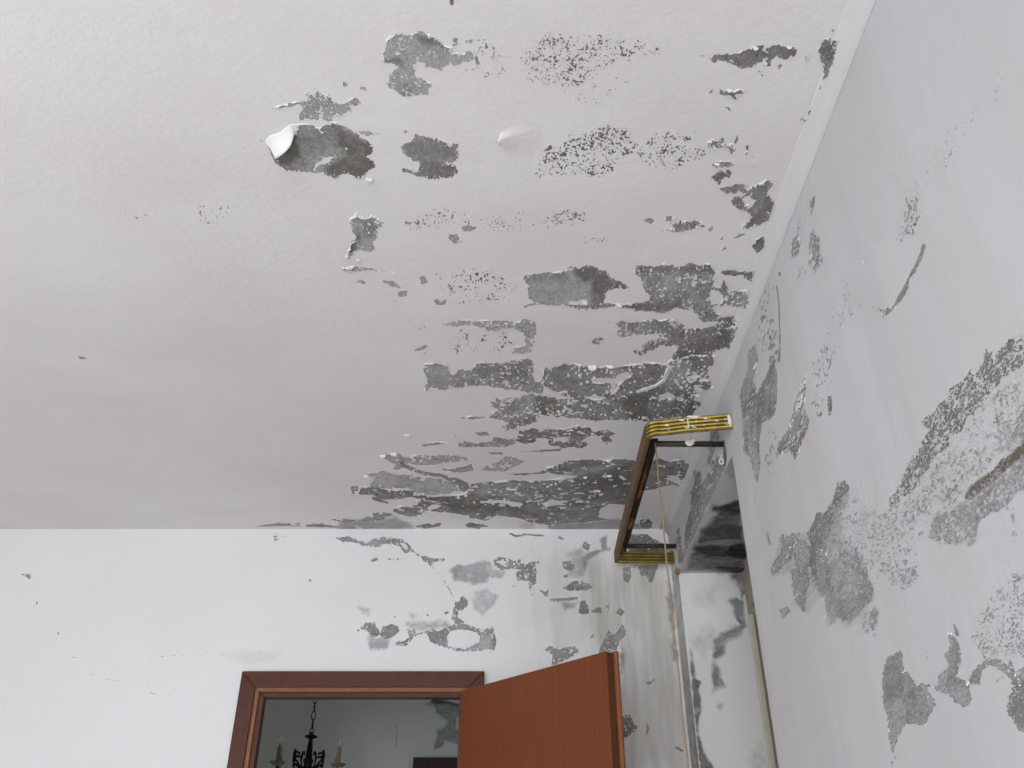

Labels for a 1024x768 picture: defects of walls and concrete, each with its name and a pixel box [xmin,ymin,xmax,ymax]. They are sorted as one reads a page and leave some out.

peeling [381,31,480,97]
peeling [710,29,839,89]
peeling [265,87,375,183]
peeling [401,131,459,180]
peeling [644,136,774,253]
peeling [341,212,407,297]
peeling [351,262,836,526]
peeling [766,335,1024,636]
peeling [357,596,497,652]
peeling [882,573,1024,763]